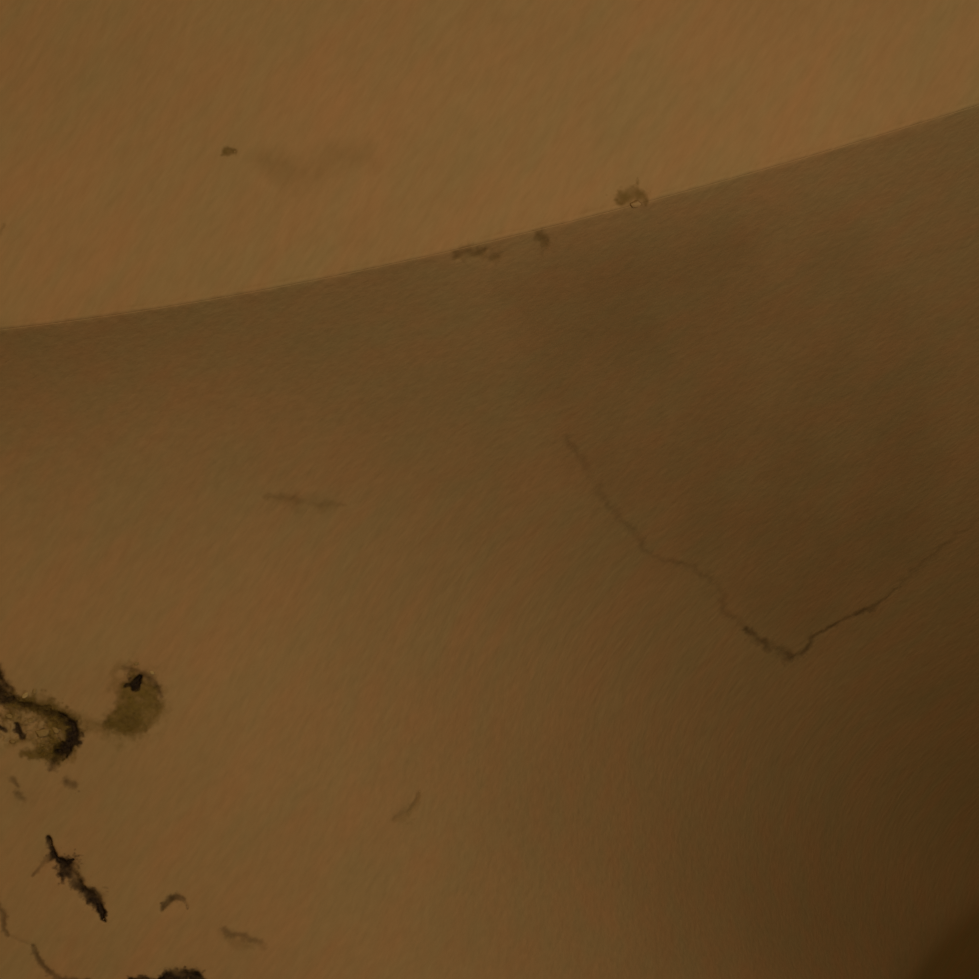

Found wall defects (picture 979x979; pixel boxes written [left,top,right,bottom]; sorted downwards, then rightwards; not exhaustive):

spalling [0,673,83,764]
crack [47,835,107,922]
crack [129,970,203,979]